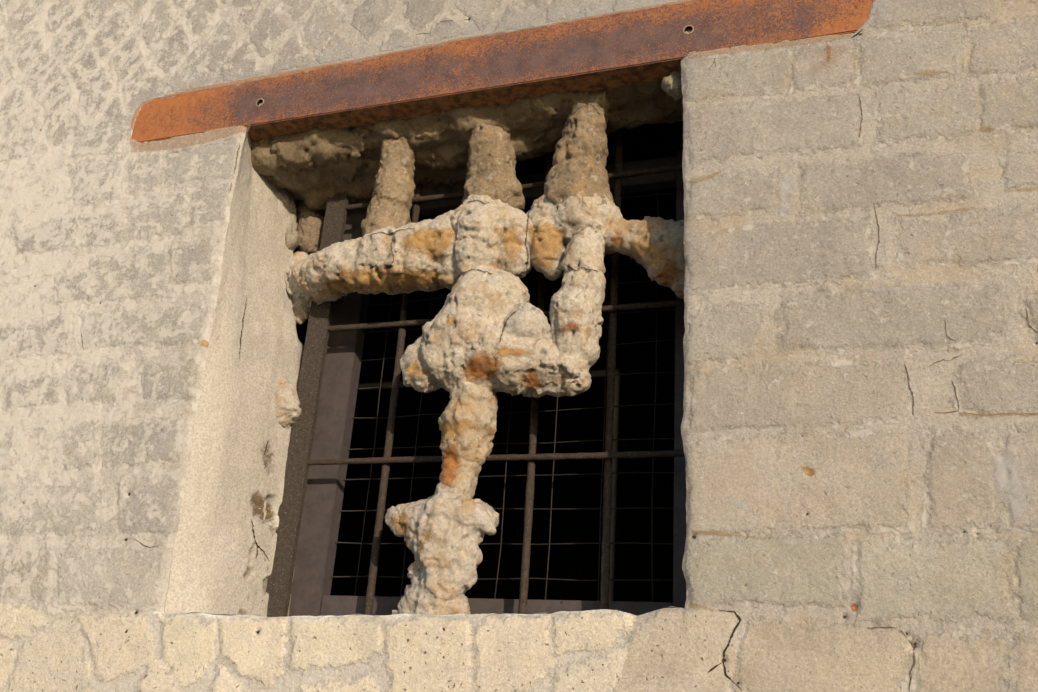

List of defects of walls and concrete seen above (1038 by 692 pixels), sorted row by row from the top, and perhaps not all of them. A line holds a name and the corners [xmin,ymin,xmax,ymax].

rust [132,125,249,153]
crack [873,203,881,270]
crack [239,295,247,360]
crack [904,322,1035,415]
spalling [251,491,273,521]
crack [708,609,742,690]
crack [867,626,916,691]